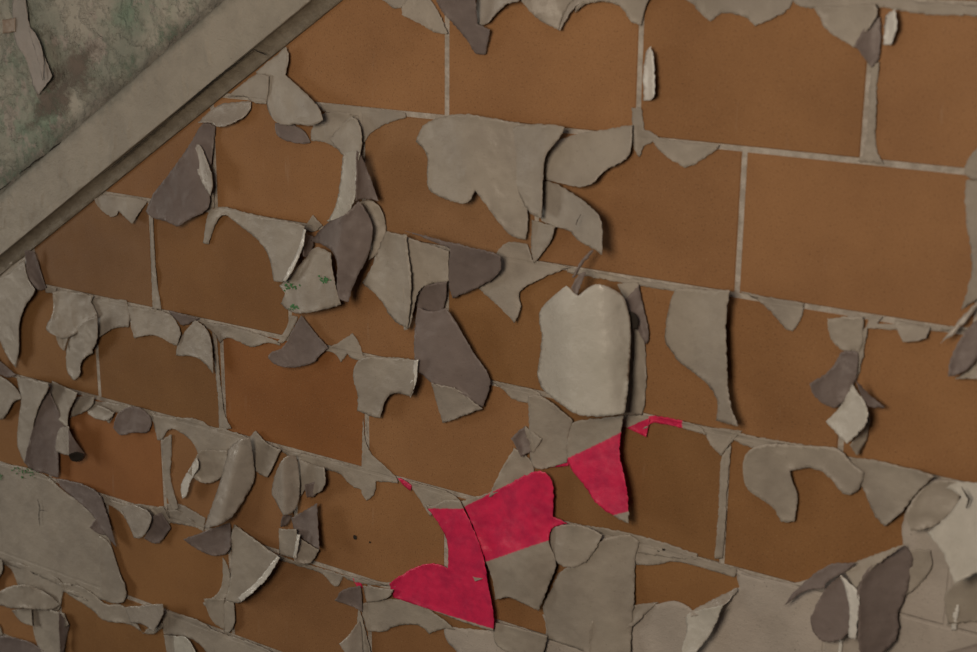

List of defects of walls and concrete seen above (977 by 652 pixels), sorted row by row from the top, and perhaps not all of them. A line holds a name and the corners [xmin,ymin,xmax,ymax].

flaking render [2,0,52,94]
peeling [383,0,649,55]
peeling [687,0,977,164]
peeling [0,47,738,652]
peeling [416,107,977,631]
peeling [785,543,933,652]